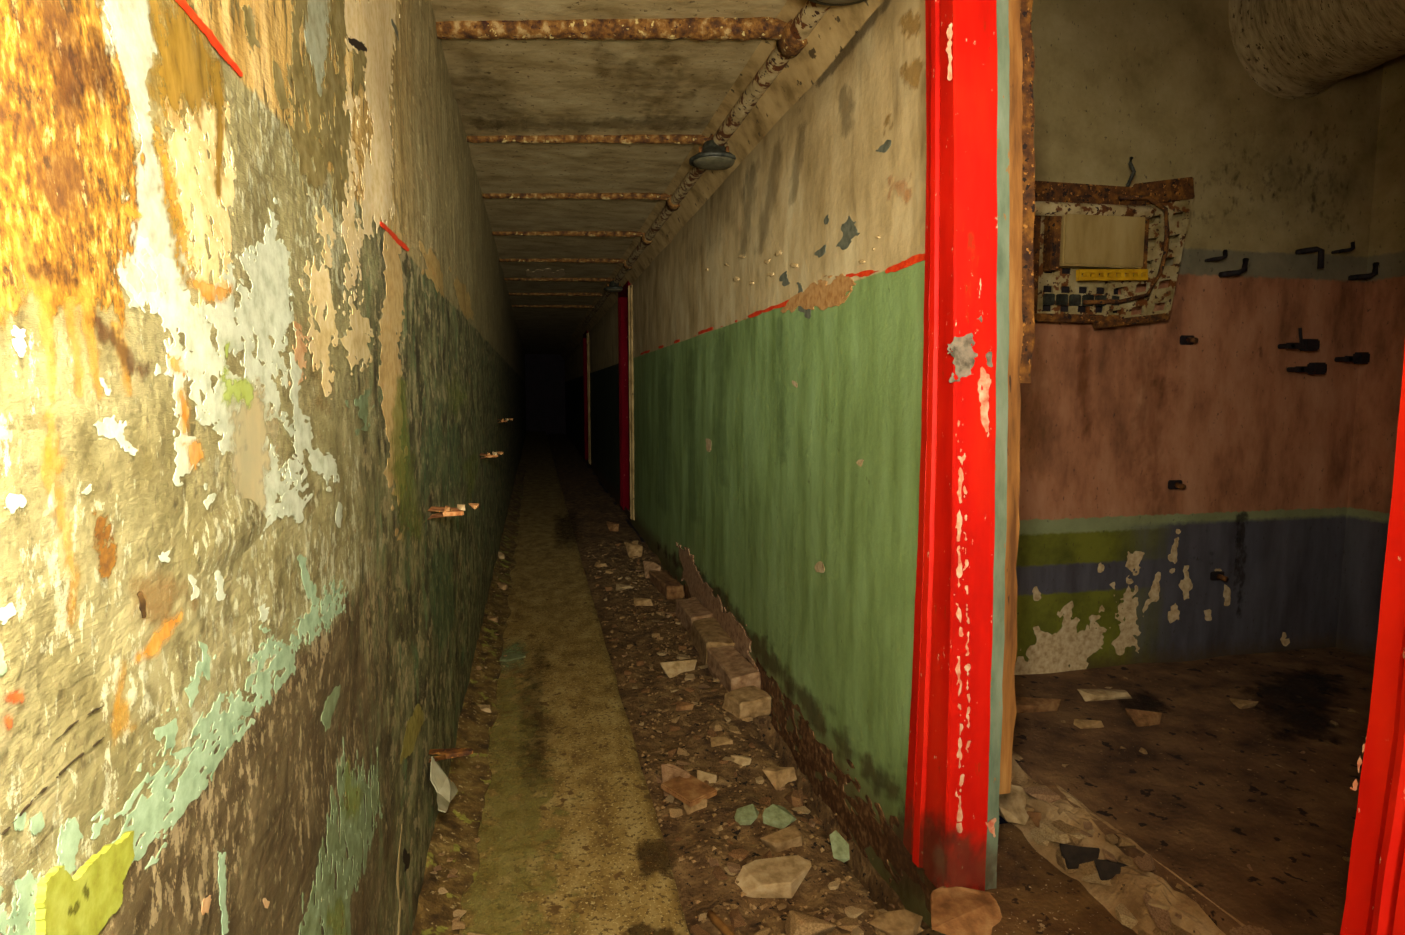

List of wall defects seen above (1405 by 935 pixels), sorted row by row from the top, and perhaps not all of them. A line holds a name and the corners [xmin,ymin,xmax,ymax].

rust [0,0,147,377]
peeling [103,0,408,540]
peeling [779,271,856,319]
peeling [814,215,860,258]
peeling [93,415,138,456]
peeling [954,420,971,833]
peeling [1014,529,1193,675]
peeling [1204,569,1231,621]
peeling [0,554,353,935]
peeling [299,685,383,935]
peeling [985,818,996,837]